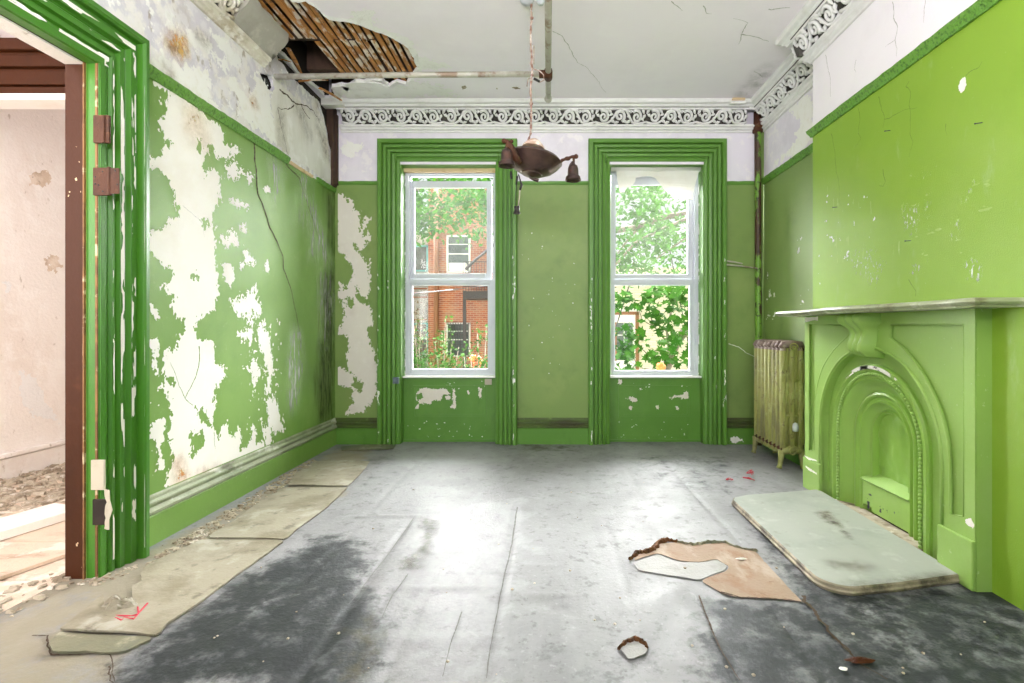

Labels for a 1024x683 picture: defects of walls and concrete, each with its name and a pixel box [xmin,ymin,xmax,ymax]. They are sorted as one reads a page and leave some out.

peeling [9,0,47,22]
peeling [62,0,98,31]
crack [671,1,789,43]
peeling [59,7,467,488]
crack [253,143,301,343]
peeling [415,382,482,409]